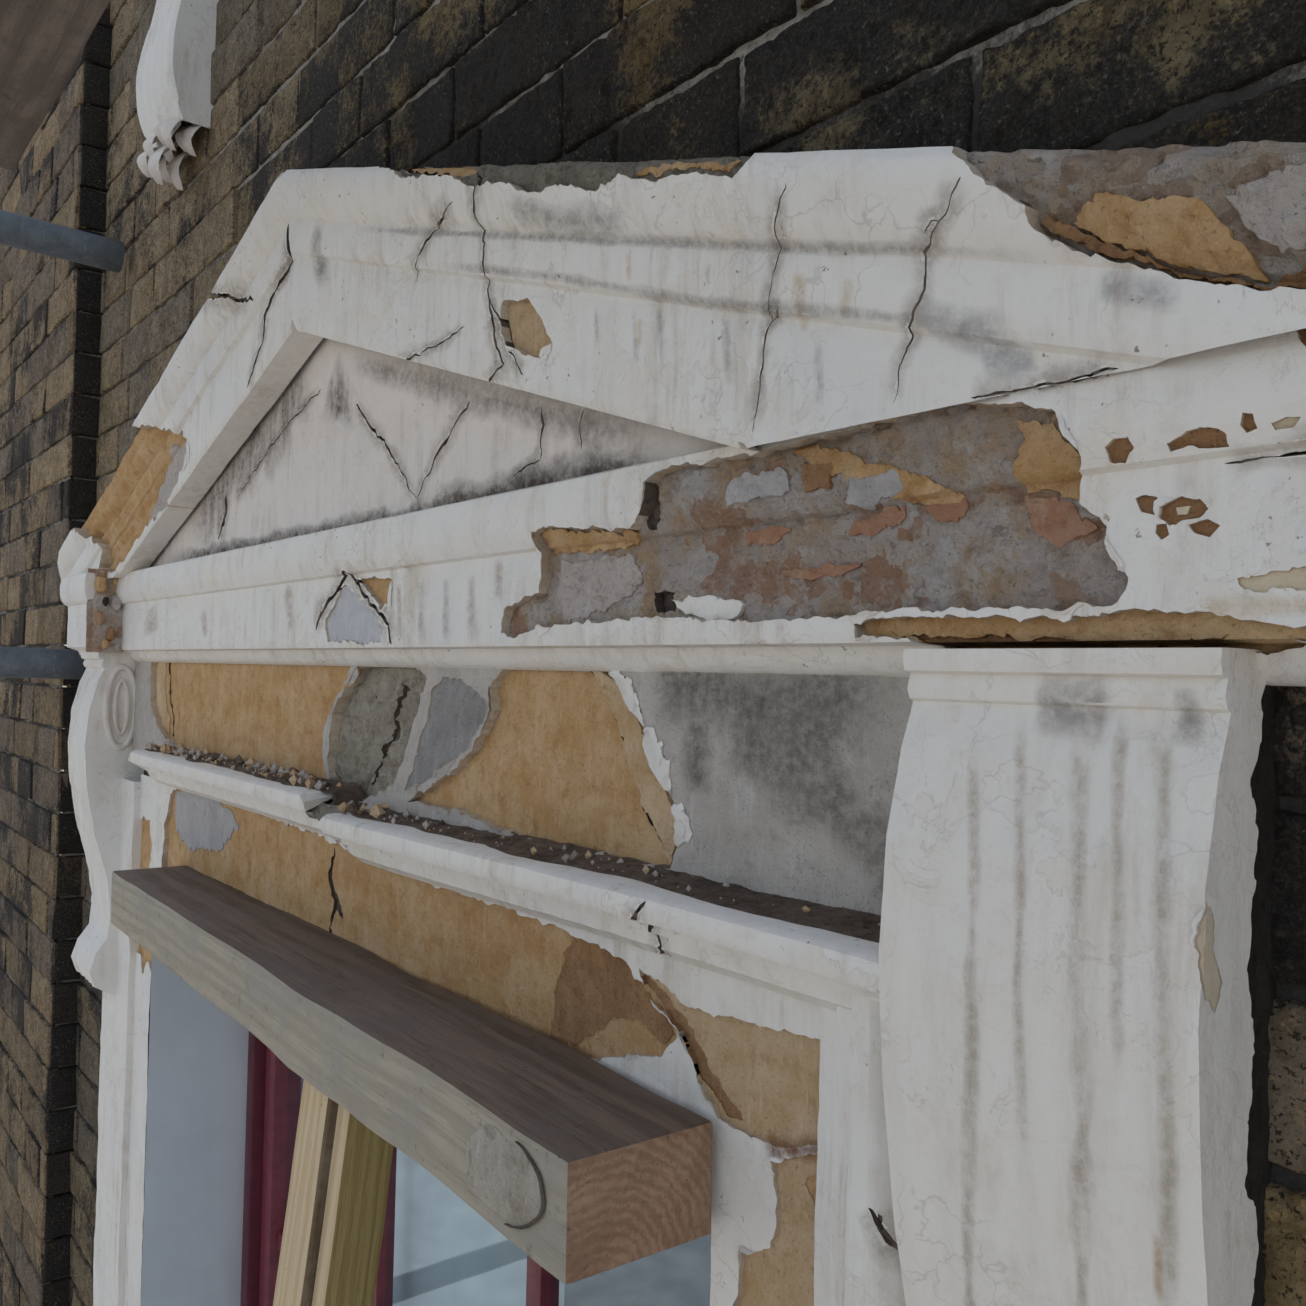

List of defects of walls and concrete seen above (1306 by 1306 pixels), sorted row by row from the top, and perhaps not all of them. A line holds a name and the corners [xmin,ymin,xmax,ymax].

spalling [71,424,196,653]
crack [209,224,293,387]
crack [356,173,523,498]
crack [512,405,545,478]
crack [752,184,786,432]
spalling [501,402,1306,655]
crack [893,178,960,404]
spalling [952,140,1306,291]
spalling [150,662,692,869]
crack [328,848,343,933]
spalling [138,789,820,1306]
peeling [1245,685,1280,1306]